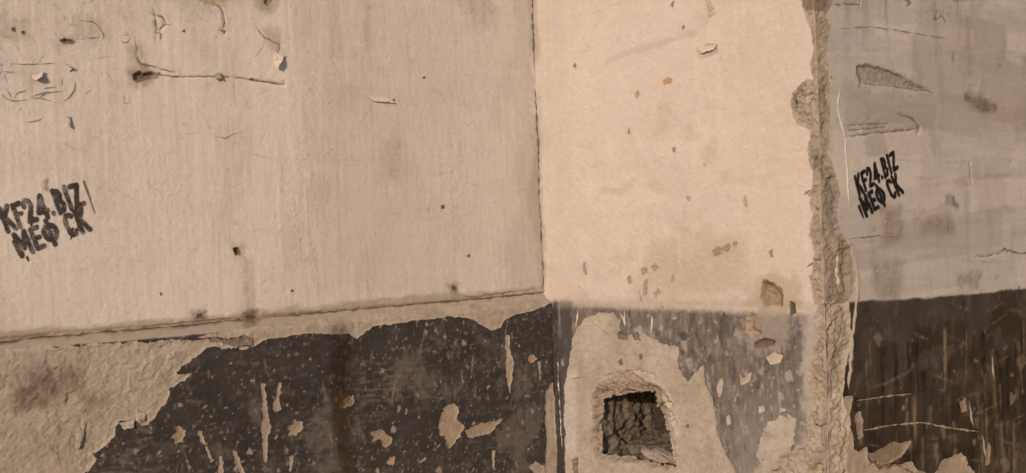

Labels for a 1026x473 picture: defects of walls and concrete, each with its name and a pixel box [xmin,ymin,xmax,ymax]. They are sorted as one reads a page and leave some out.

crack [0,0,544,344]
peeling [0,296,550,473]
peeling [529,312,736,473]
spalling [745,279,796,365]
spalling [756,0,991,473]